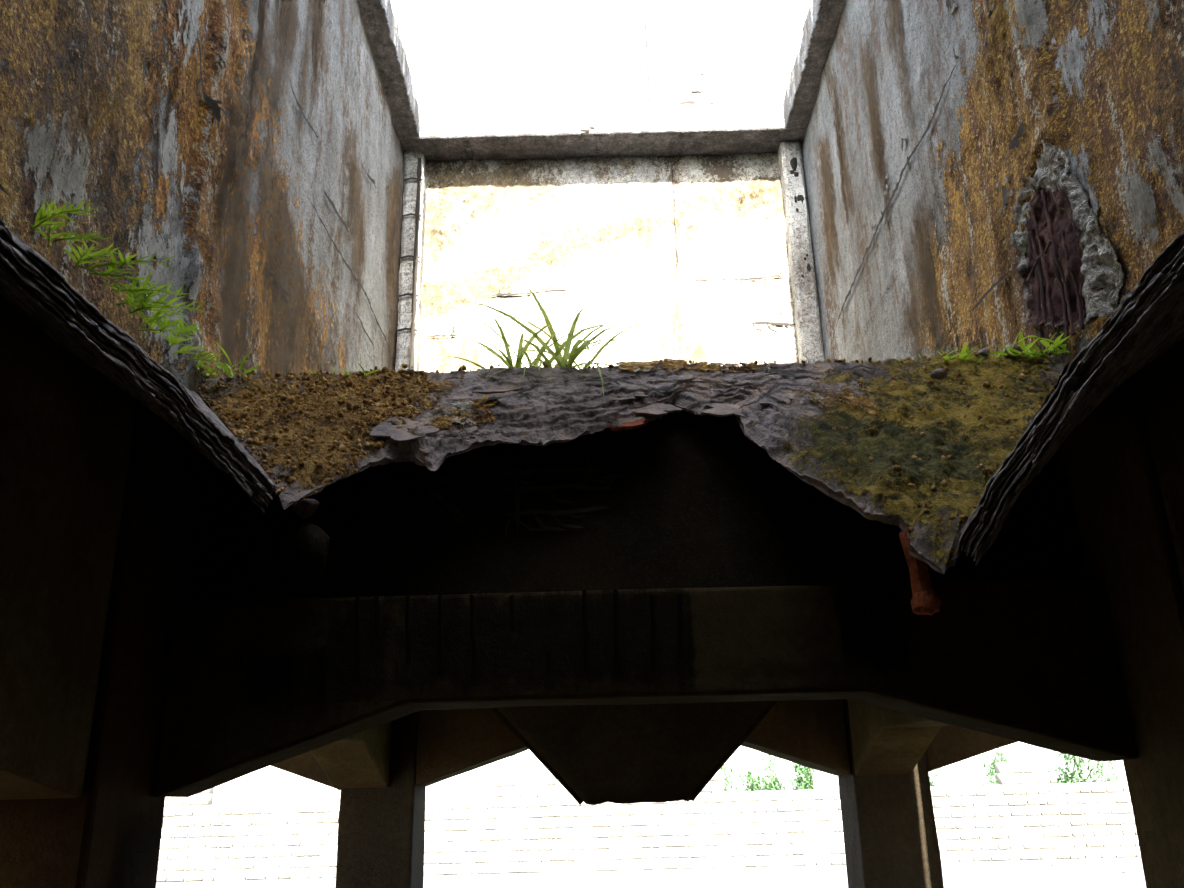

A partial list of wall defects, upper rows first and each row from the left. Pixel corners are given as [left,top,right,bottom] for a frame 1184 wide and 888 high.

damp [214,0,329,376]
damp [342,130,366,304]
damp [386,168,403,371]
damp [358,0,854,281]
crack [752,321,795,333]
crack [725,365,910,432]
damp [860,41,895,237]
damp [884,0,918,144]
crack [836,47,966,326]
damp [903,194,945,360]
rust [911,0,1184,366]
spalling [1002,140,1124,355]